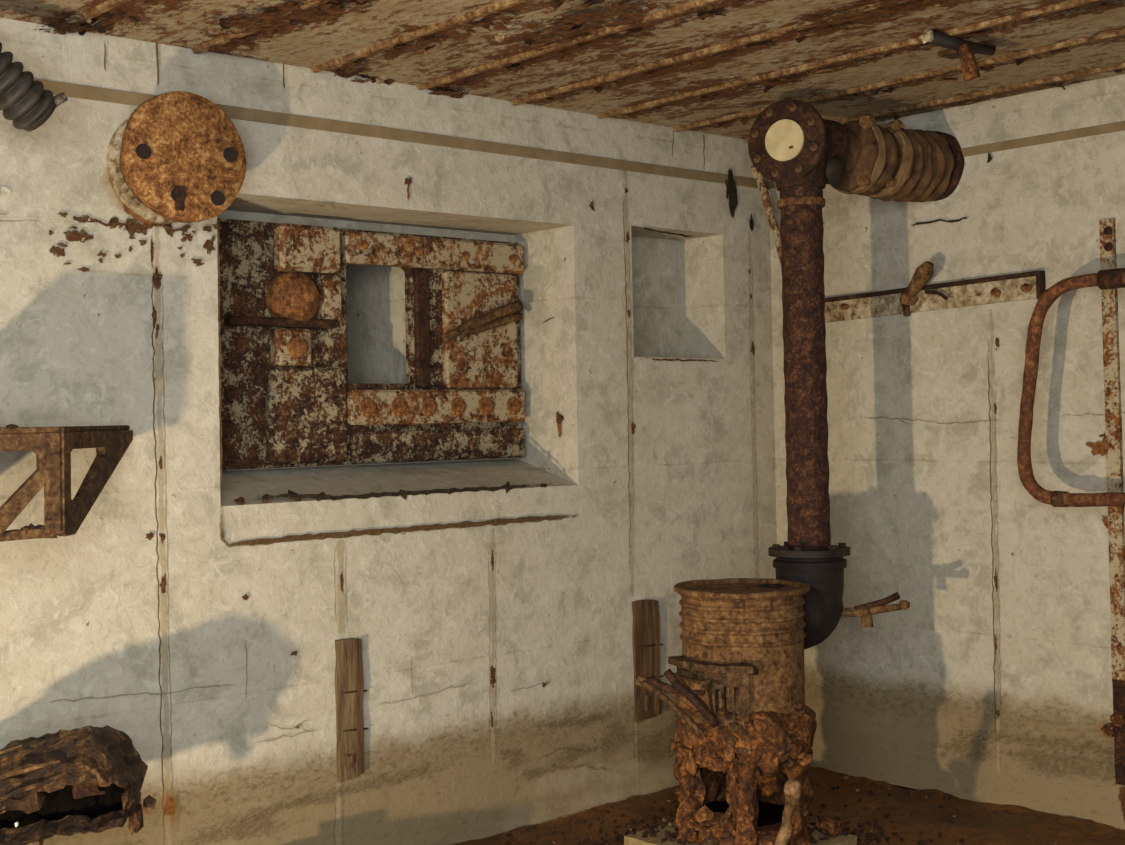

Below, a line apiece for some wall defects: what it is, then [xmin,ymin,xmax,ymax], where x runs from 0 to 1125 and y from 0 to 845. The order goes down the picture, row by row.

corrosion [123,203,152,227]
crack [912,217,967,226]
corrosion [556,412,564,437]